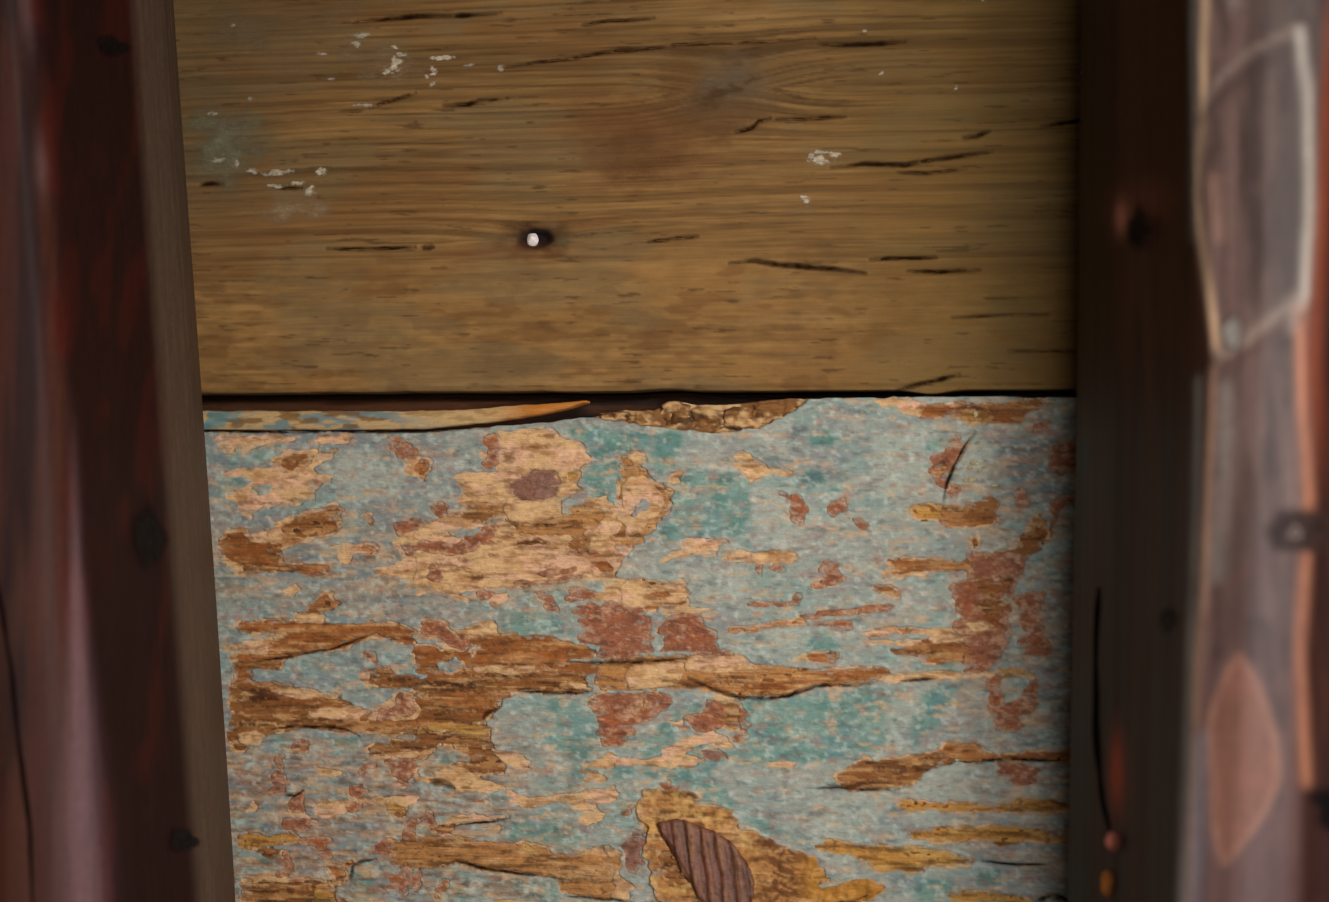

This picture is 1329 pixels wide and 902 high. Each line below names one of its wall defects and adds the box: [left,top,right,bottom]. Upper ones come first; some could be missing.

spalling [599,401,796,431]
peeling [733,451,809,526]
peeling [827,496,869,531]
spalling [875,396,1076,549]
peeling [660,538,798,576]
peeling [214,427,757,901]
peeling [747,556,1039,733]
crack [1092,587,1112,832]
peeling [768,759,796,769]
peeling [996,761,1041,786]